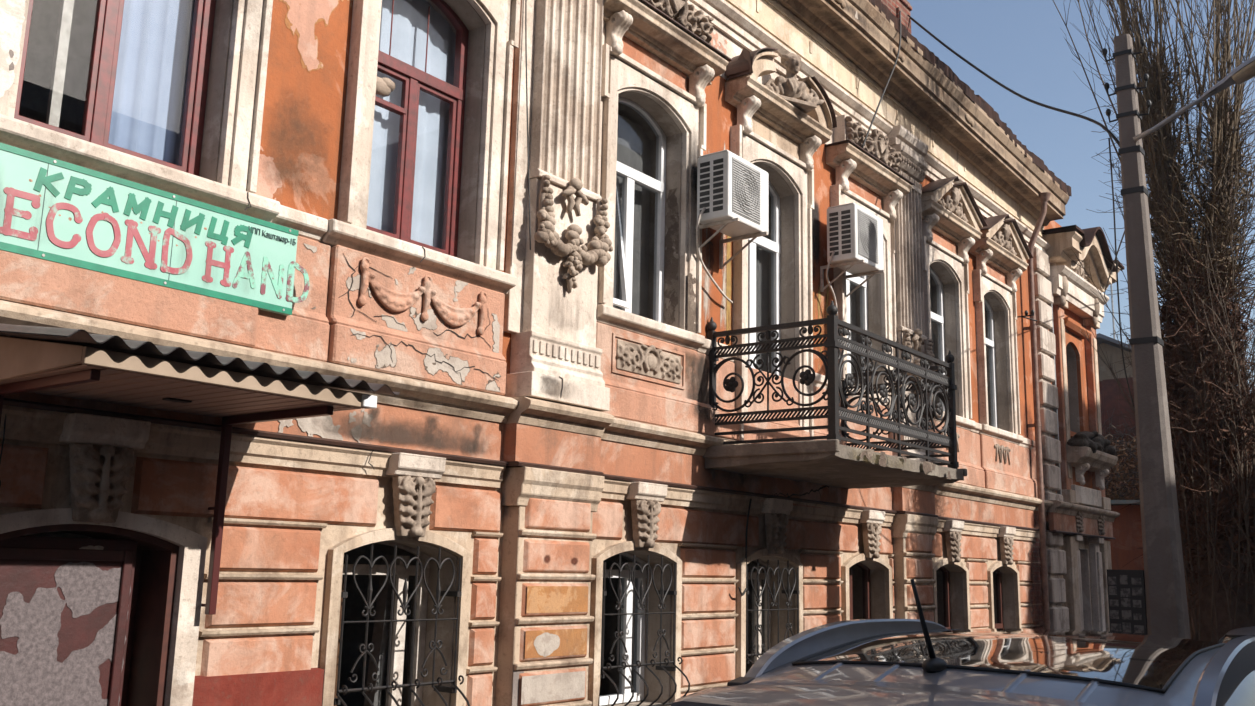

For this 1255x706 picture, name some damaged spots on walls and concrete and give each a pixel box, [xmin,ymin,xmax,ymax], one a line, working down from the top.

peeling [279,0,353,72]
spalling [346,271,372,298]
spalling [453,280,468,301]
spalling [350,307,445,369]
crack [340,253,499,381]
spalling [492,313,500,353]
damp [329,371,473,406]
spalling [424,347,470,385]
spalling [485,371,501,392]
damp [344,408,480,452]